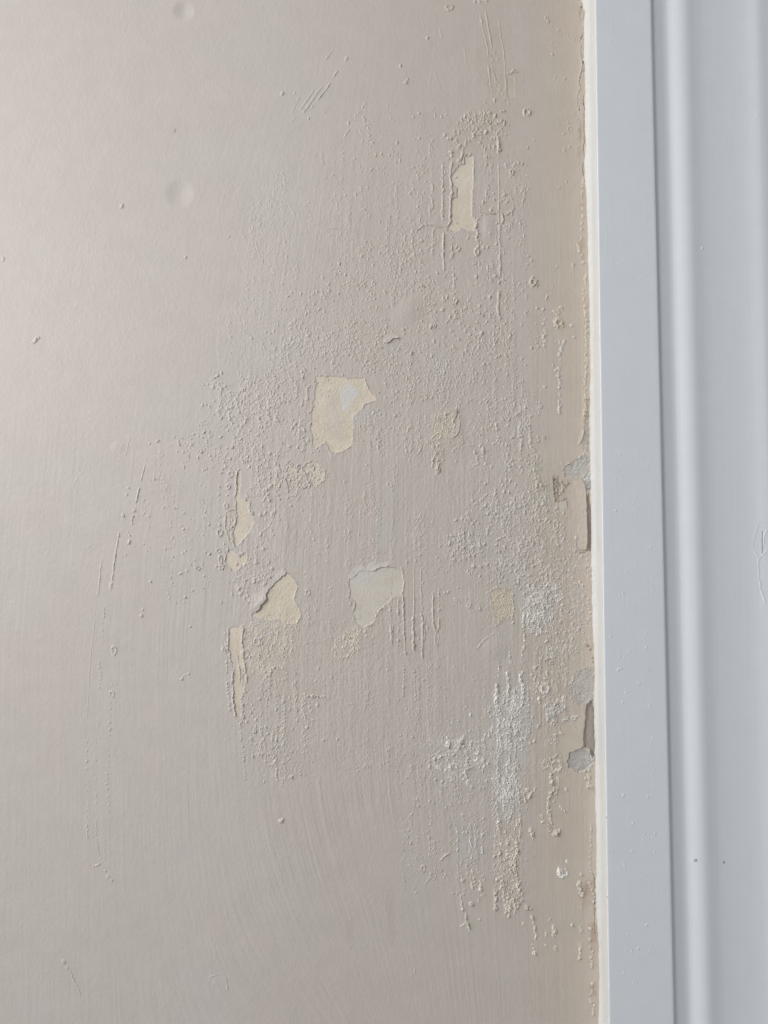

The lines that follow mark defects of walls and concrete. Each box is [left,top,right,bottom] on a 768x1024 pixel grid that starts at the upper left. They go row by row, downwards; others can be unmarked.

peeling [440,141,481,259]
peeling [223,470,254,573]
peeling [270,376,377,493]
peeling [552,396,591,549]
peeling [221,561,405,780]
spalling [567,644,595,773]